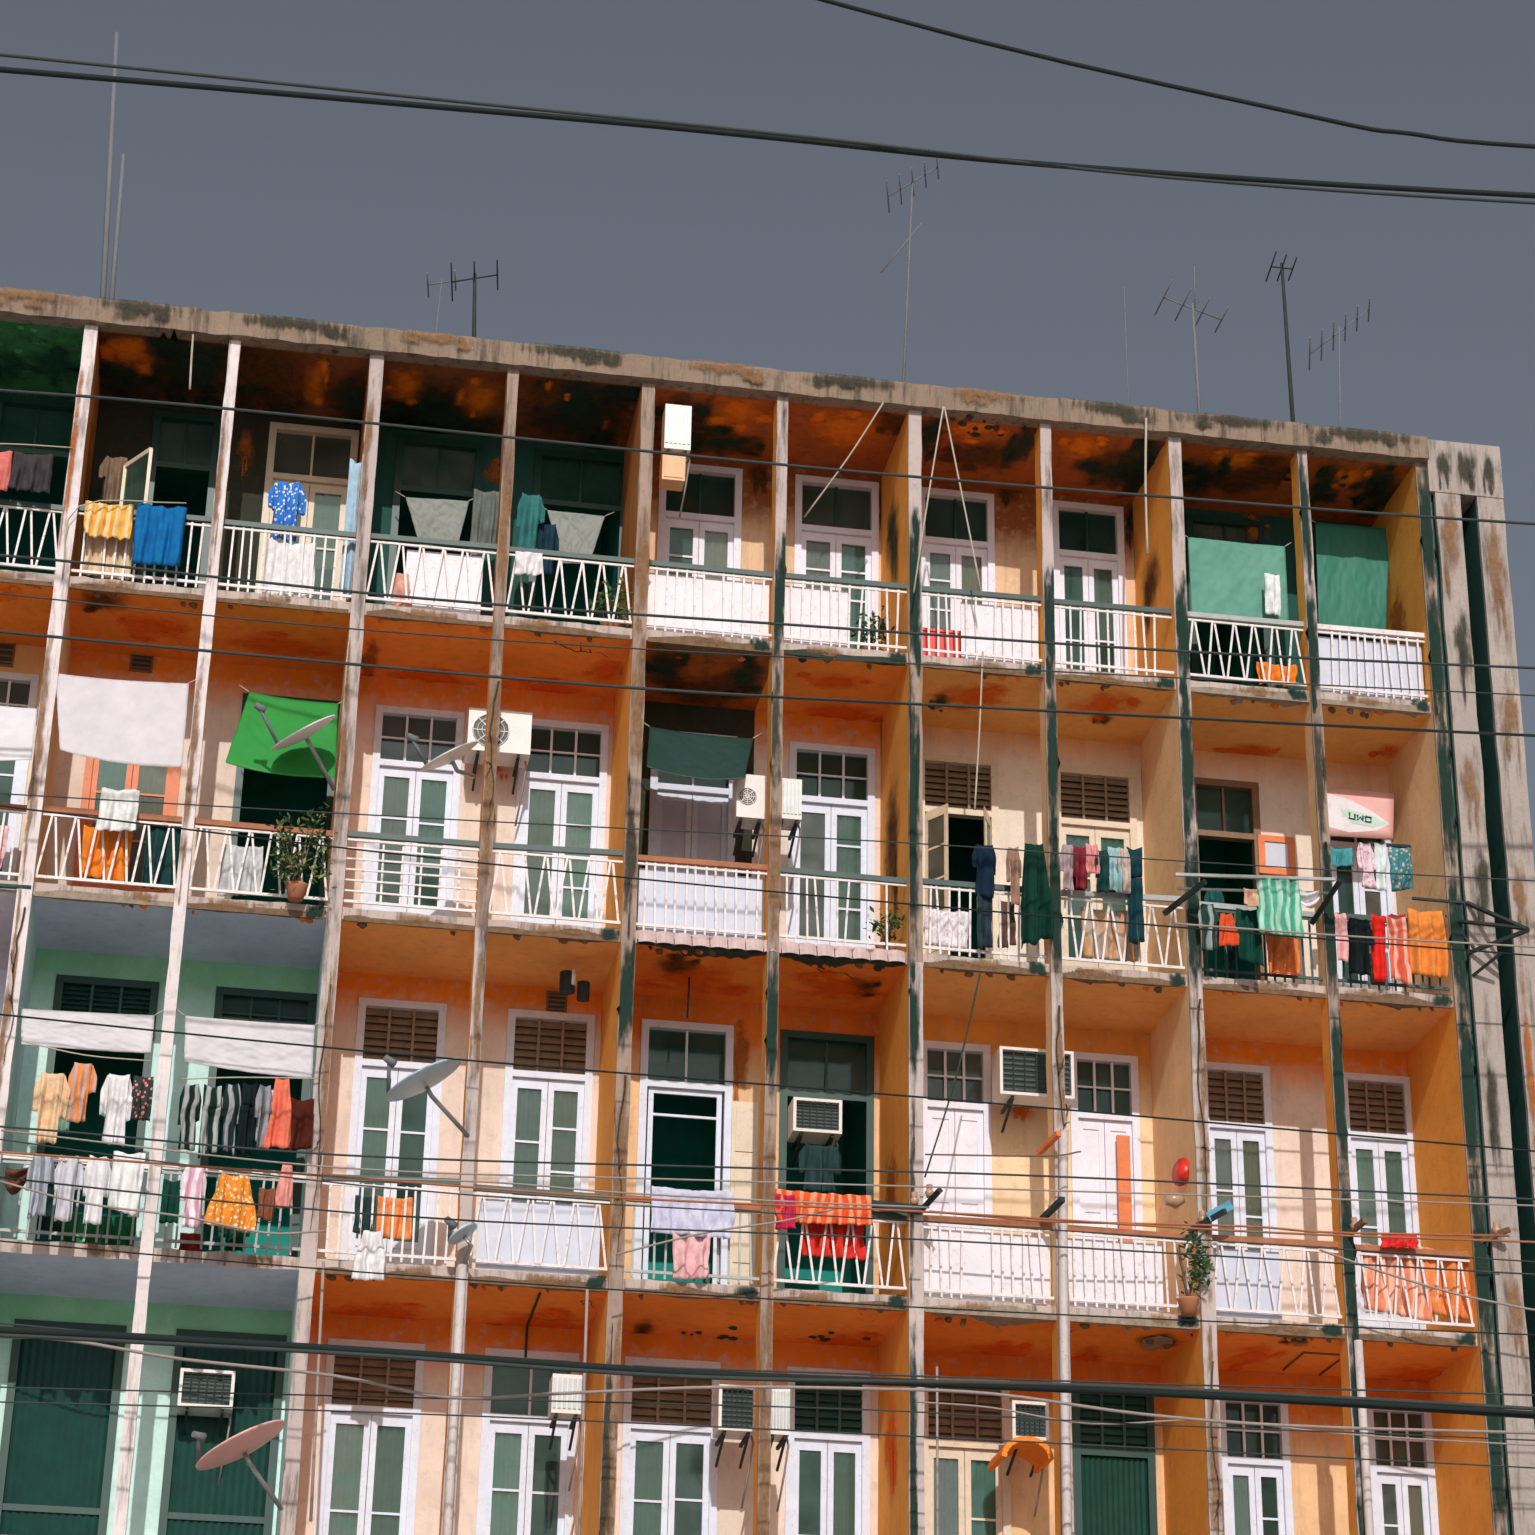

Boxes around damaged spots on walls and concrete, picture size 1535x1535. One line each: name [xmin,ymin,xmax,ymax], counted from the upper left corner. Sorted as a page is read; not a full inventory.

water stain [631,508,787,785]
water stain [921,418,1036,471]
water stain [1073,399,1165,552]
water stain [1144,559,1157,629]
water stain [1182,451,1398,992]
water stain [1307,424,1410,445]
water stain [1411,452,1494,861]
water stain [1157,575,1211,1270]
water stain [1331,1011,1348,1157]
water stain [1434,852,1524,1529]
water stain [1208,1400,1225,1535]
water stain [1281,1185,1365,1535]